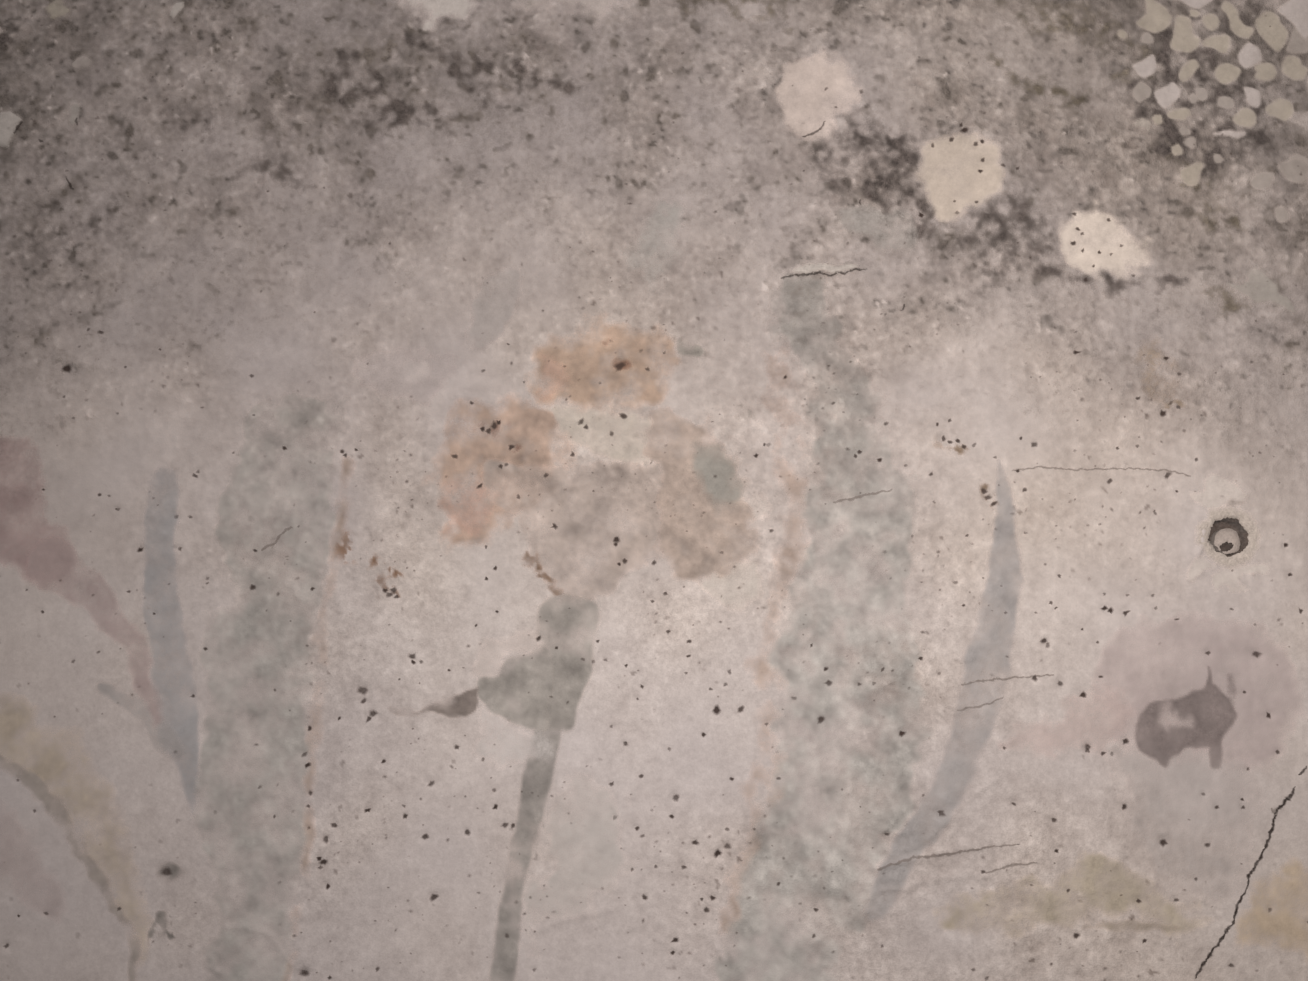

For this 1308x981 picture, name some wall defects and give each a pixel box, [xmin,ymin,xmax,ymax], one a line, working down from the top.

peeling [408,0,473,30]
spalling [777,52,863,140]
peeling [1118,0,1308,189]
spalling [918,123,1019,222]
water stain [0,0,1308,467]
spalling [1060,211,1148,282]
crack [1195,766,1307,979]